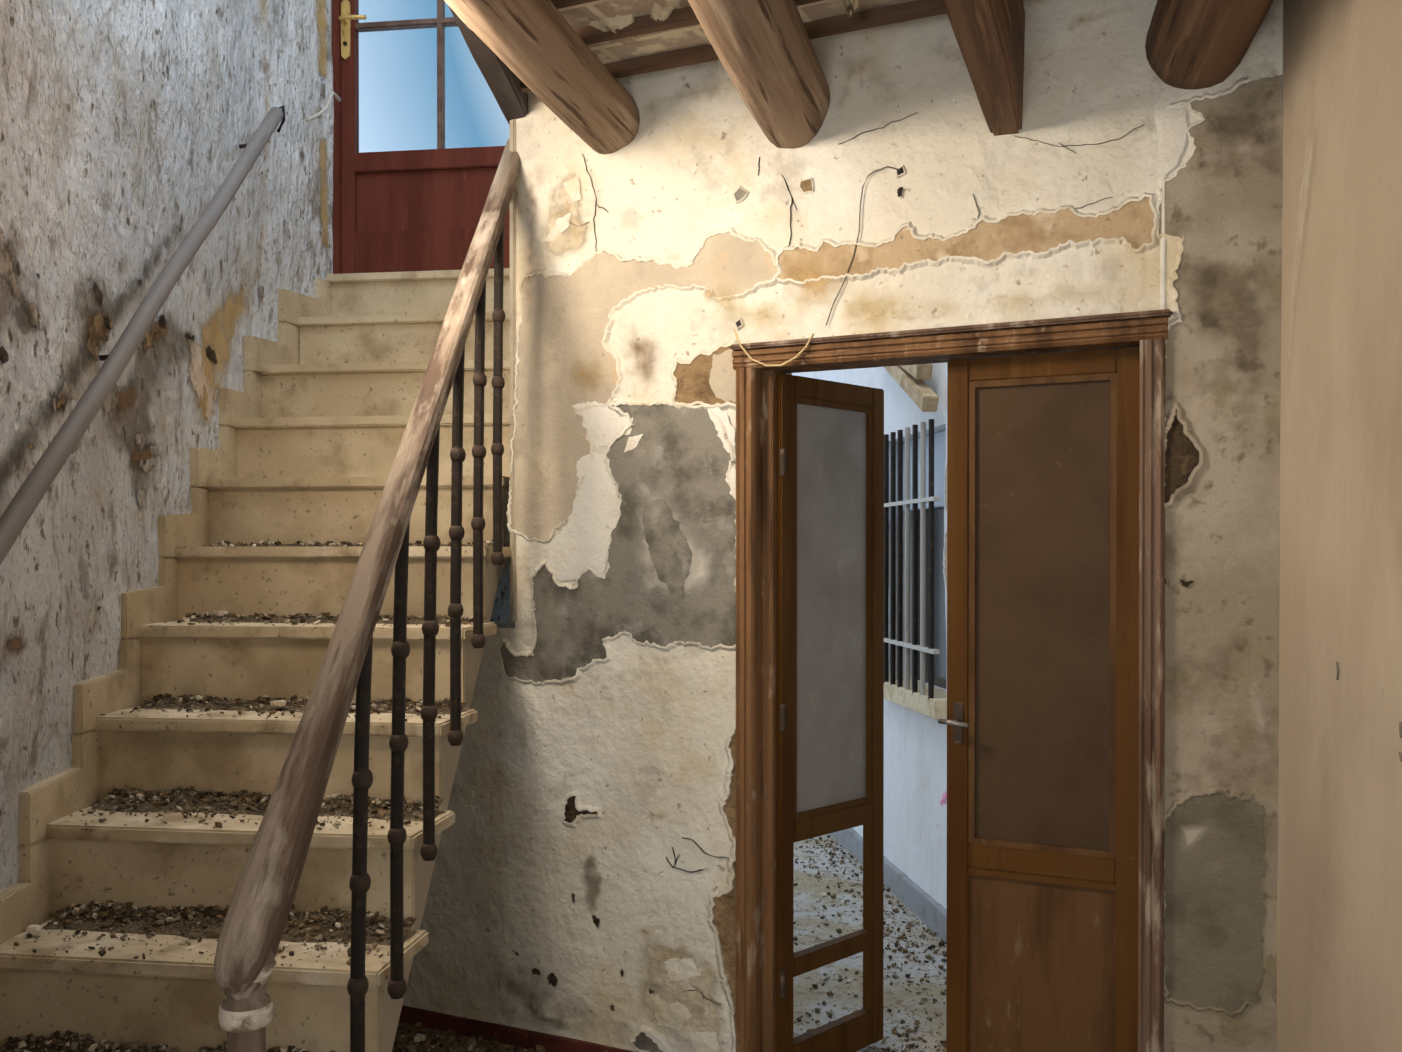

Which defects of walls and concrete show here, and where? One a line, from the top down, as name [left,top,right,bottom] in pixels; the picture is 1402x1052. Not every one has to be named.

peeling [591,3,674,33]
crack [838,112,918,145]
crack [1014,124,1144,153]
peeling [0,227,40,330]
flaking render [137,314,166,353]
damp [1200,265,1260,368]
peeling [0,346,8,364]
peeling [185,333,217,424]
peeling [497,75,1283,1052]